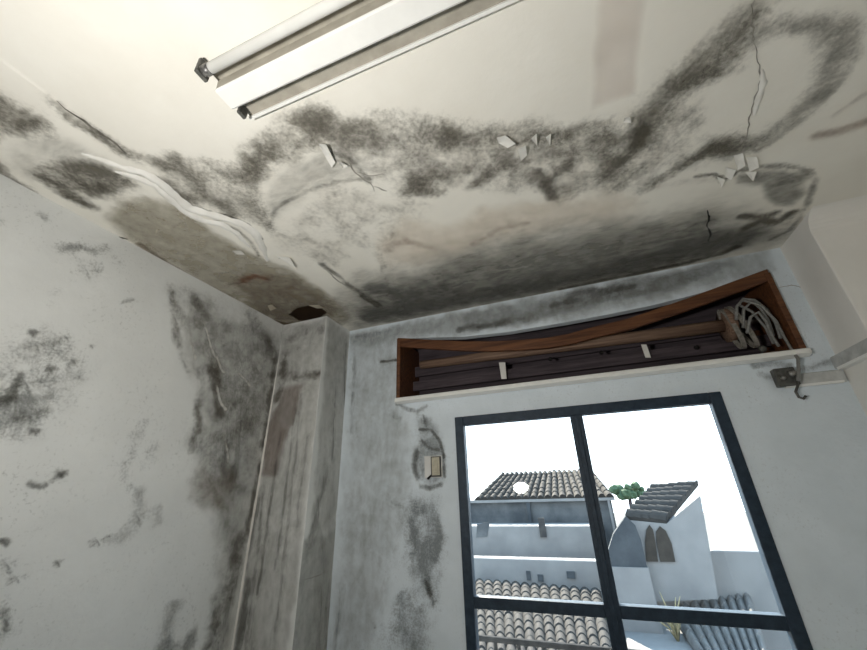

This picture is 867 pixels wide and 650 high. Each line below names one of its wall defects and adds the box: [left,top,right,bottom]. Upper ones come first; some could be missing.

leakage [0,98,42,135]
leakage [33,161,131,208]
peeling [81,153,296,268]
leakage [153,157,266,221]
leakage [116,204,347,325]
leakage [238,140,282,183]
leakage [290,109,381,154]
leakage [345,166,802,322]
leakage [524,9,759,180]
crack [705,210,713,242]
crack [742,0,768,145]
spalling [276,305,326,324]